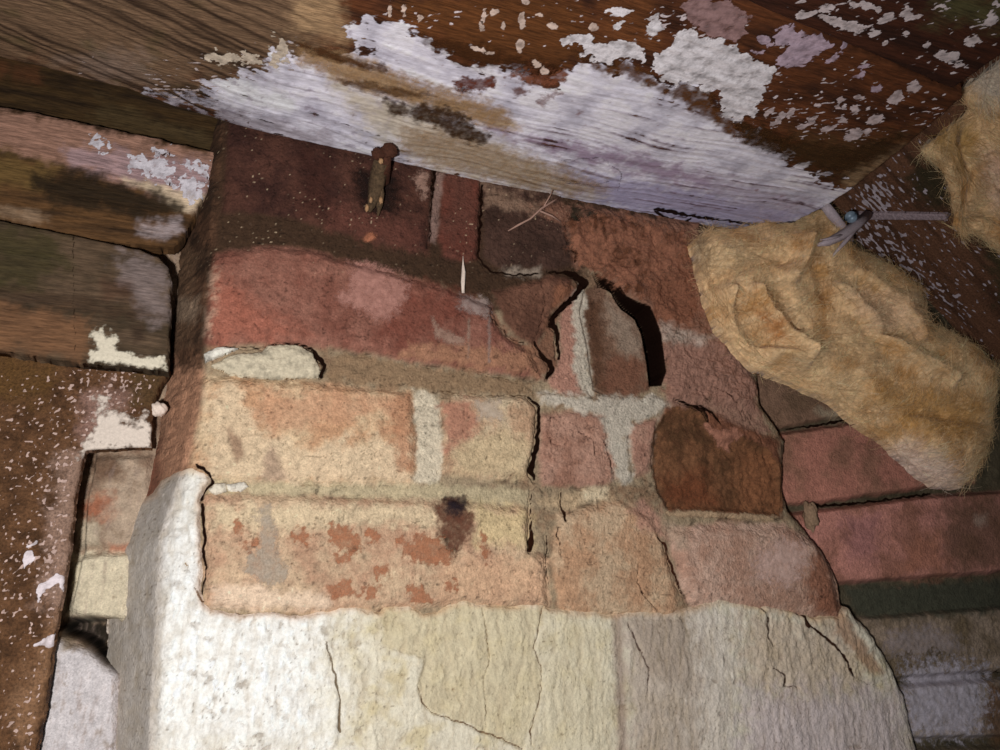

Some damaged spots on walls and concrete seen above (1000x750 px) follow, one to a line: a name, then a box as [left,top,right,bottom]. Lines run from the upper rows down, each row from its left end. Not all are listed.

peeling [453,76,496,93]
peeling [510,0,949,142]
peeling [923,34,983,68]
peeling [127,147,211,205]
corrosion [353,168,398,212]
crack [477,185,589,380]
peeling [22,541,37,568]
crack [195,464,215,602]
leakage [447,499,466,515]
crack [494,377,566,579]
crack [795,613,853,676]
crack [418,614,542,749]